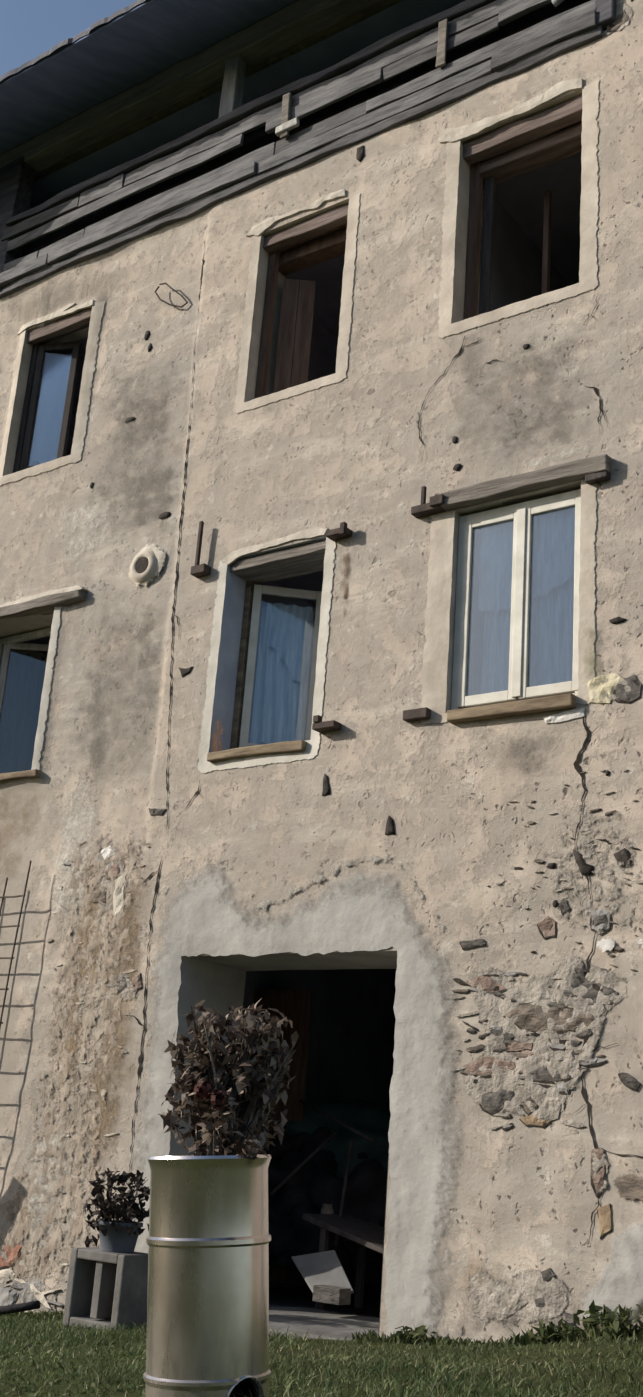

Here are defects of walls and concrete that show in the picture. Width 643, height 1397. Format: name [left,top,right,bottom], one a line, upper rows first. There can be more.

crack [166,241,205,825]
crack [418,336,503,447]
crack [585,386,608,433]
flaking render [0,830,150,1314]
crack [125,859,162,1172]
flaking render [448,790,643,1131]
crack [571,716,616,973]
crack [565,1004,643,1158]
crack [588,1192,602,1243]